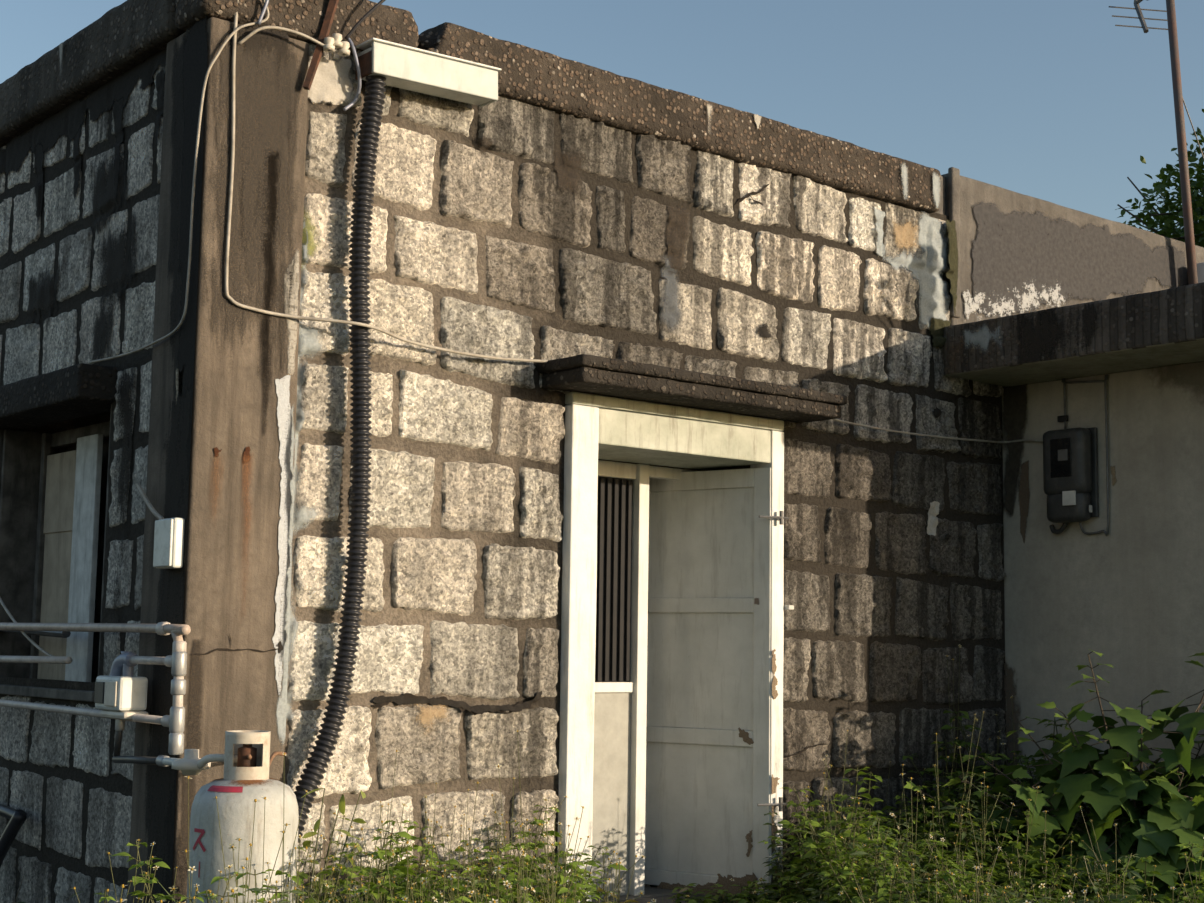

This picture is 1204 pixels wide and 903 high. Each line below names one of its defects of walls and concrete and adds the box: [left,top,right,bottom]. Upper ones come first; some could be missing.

peeling [874,207,947,327]
peeling [962,281,1066,350]
damp [0,16,302,903]
corrosion [243,447,251,488]